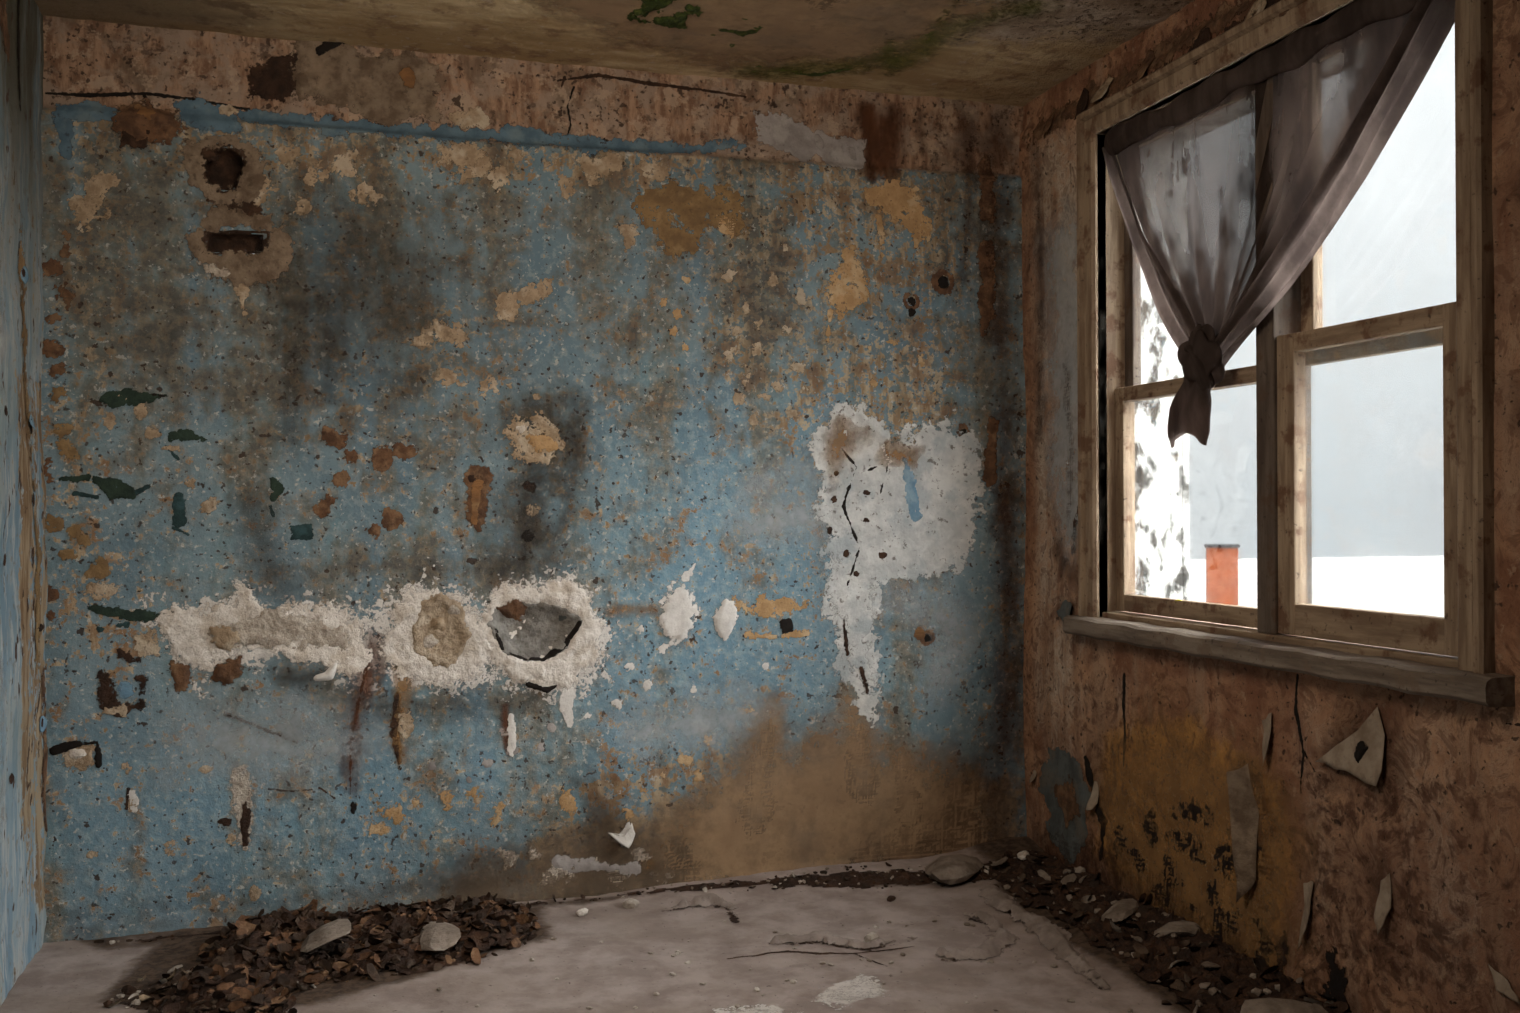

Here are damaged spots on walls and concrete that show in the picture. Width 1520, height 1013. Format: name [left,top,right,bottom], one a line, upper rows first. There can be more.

water stain [534,0,997,67]
flaking render [51,40,867,278]
peeling [721,269,738,284]
peeling [795,176,933,343]
peeling [660,298,689,371]
flaking render [15,170,653,836]
flaking render [723,301,991,729]
flaking render [198,764,256,852]
peeling [494,807,667,890]
peeling [660,753,705,782]
water stain [422,693,1003,902]